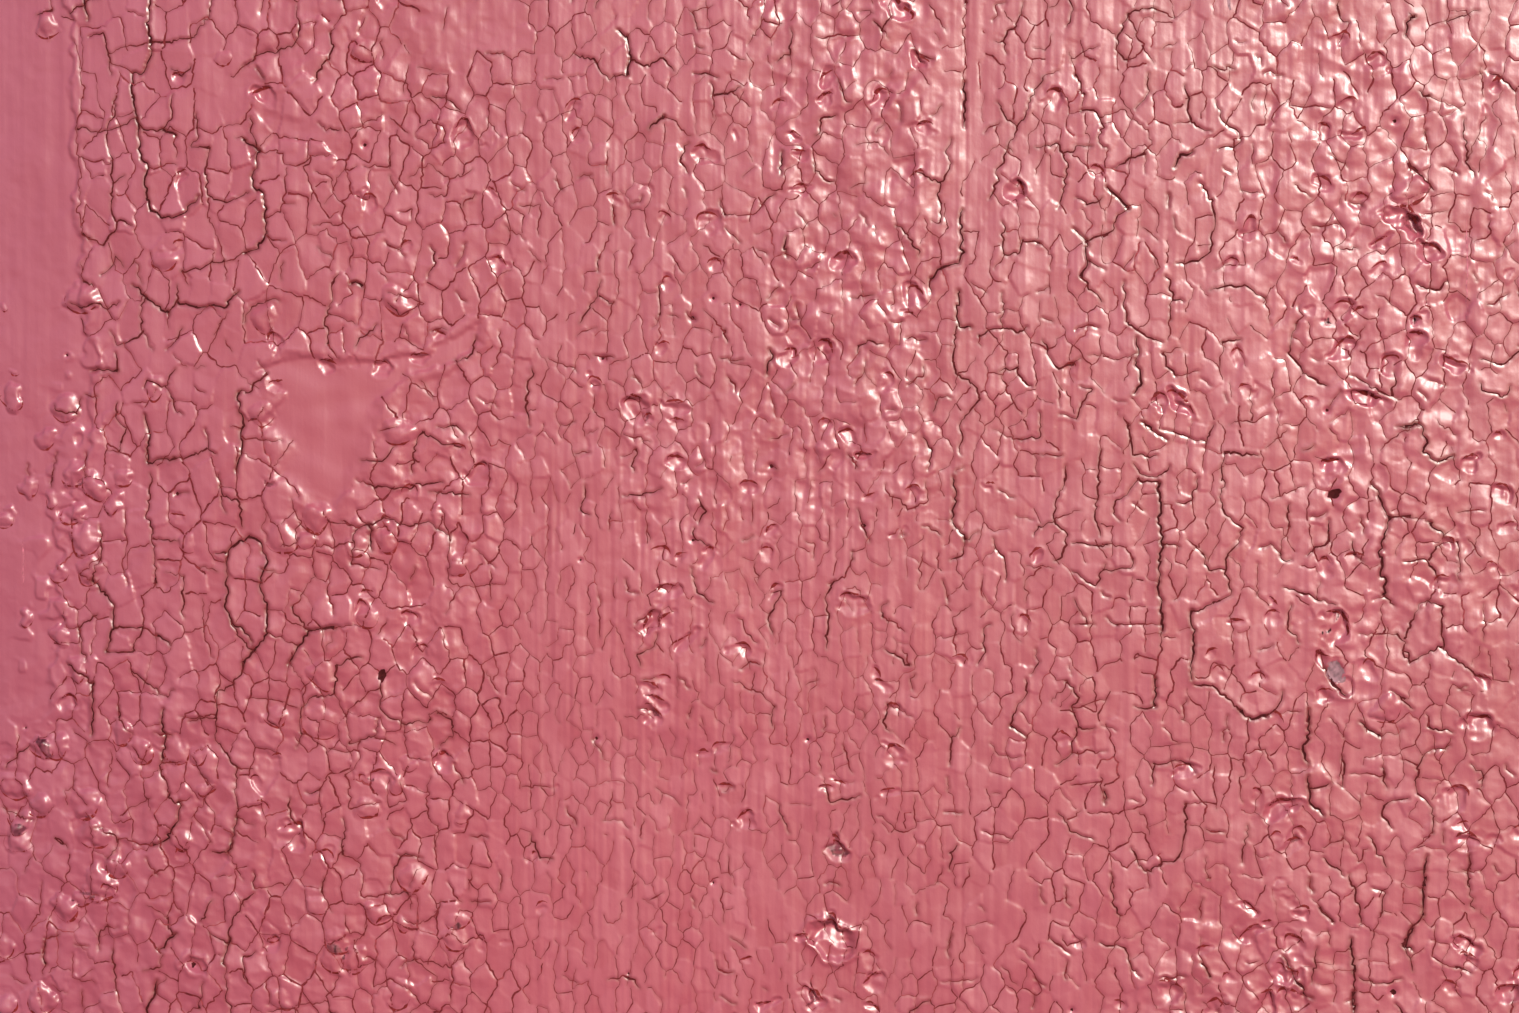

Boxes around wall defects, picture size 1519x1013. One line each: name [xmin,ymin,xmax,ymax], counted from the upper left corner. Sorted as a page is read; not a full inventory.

crack [738,0,782,45]
crack [816,0,932,102]
crack [929,0,968,127]
crack [1227,0,1329,76]
crack [1337,1,1374,94]
peeling [251,314,491,514]
crack [394,430,462,473]
crack [751,296,850,518]
crack [856,456,929,521]
crack [1180,320,1245,400]
crack [625,728,755,1013]
crack [895,905,1053,1013]